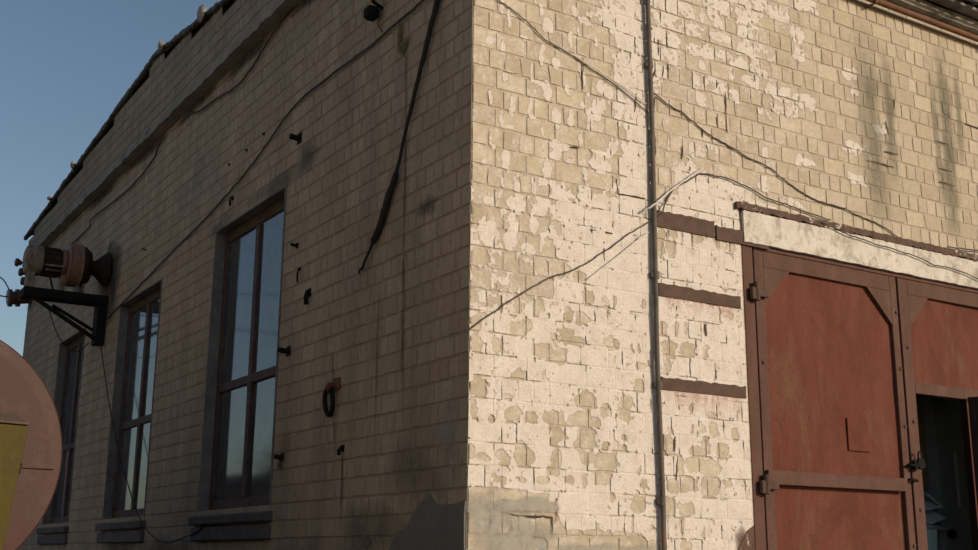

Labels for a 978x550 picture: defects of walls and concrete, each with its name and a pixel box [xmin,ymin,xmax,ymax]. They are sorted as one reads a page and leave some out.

water stain [942,99,961,191]
peeling [468,0,819,550]
spalling [389,494,476,550]